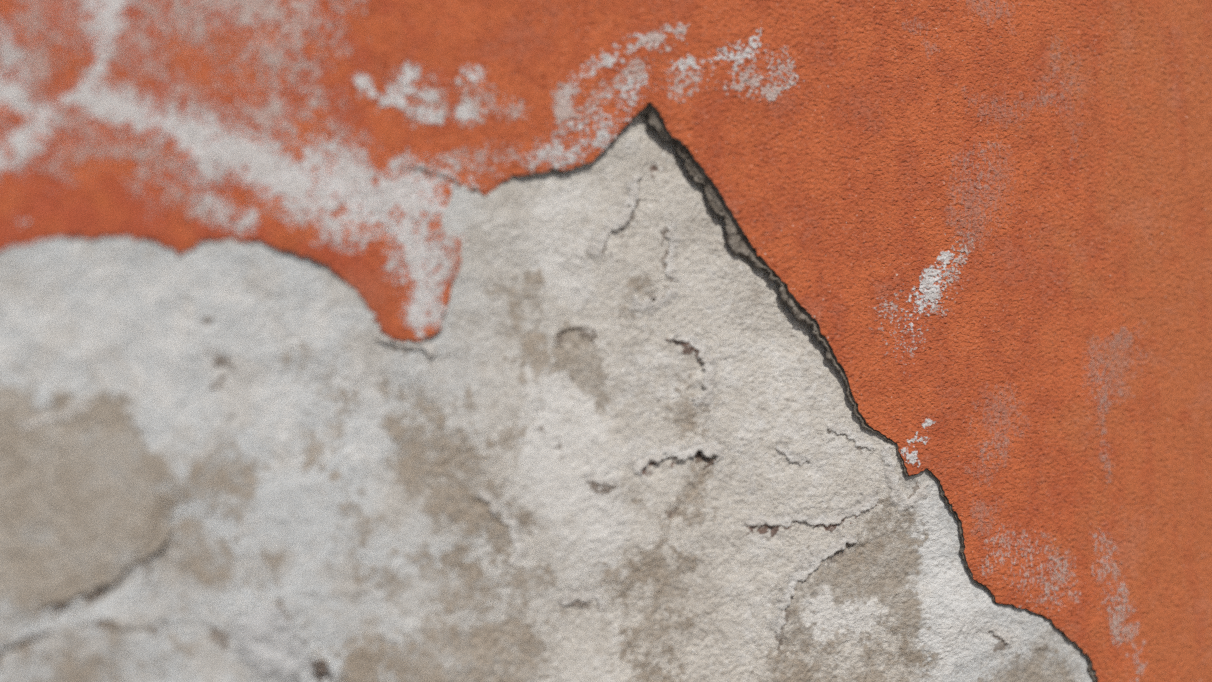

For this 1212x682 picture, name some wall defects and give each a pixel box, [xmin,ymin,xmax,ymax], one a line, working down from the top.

peeling [166,0,358,121]
peeling [551,49,654,135]
peeling [506,122,590,169]
leakage [941,245,971,287]
leakage [487,261,556,383]
crack [0,618,229,656]
leakage [769,632,929,682]